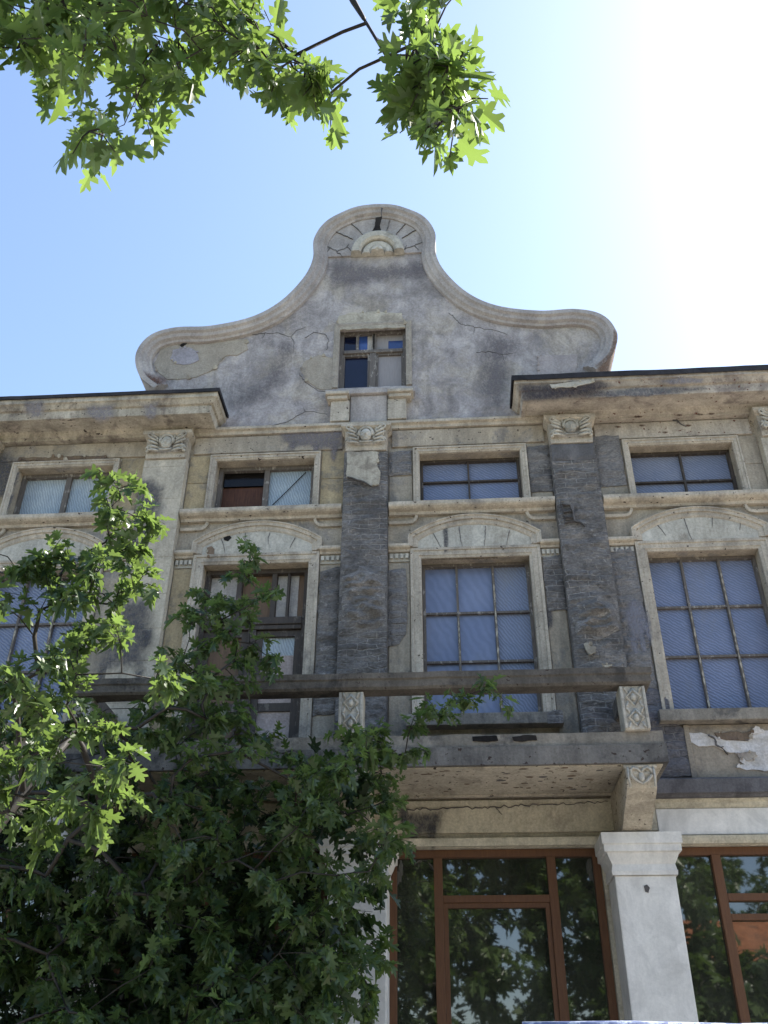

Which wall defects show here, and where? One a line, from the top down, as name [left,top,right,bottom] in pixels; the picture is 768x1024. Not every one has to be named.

crack [449,313,513,360]
crack [253,327,329,425]
flaking render [314,450,412,674]
flaking render [527,435,768,778]
flaking render [313,697,339,730]
flaking render [365,696,386,737]
crack [407,801,608,814]